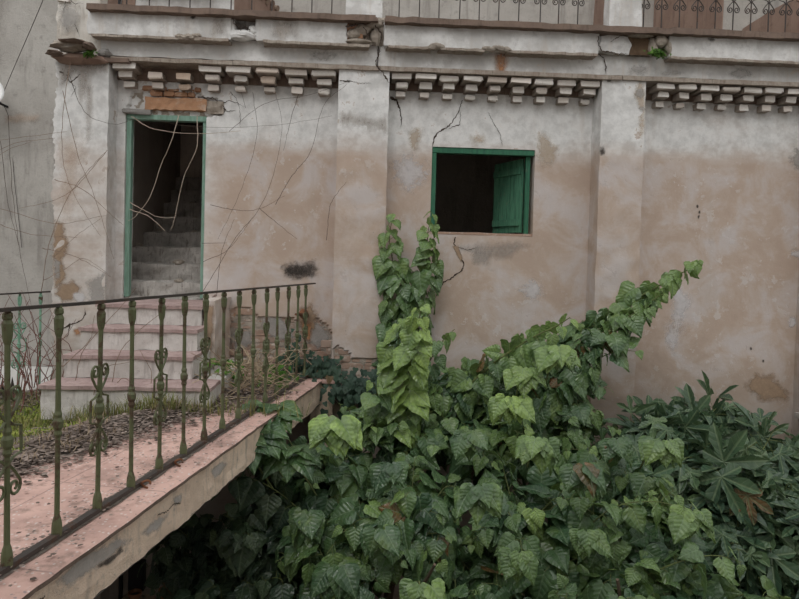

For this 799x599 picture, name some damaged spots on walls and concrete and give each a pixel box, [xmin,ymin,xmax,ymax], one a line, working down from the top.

crack [346,23,402,125]
crack [597,35,626,71]
crack [433,100,463,143]
peeling [53,224,79,302]
crack [436,237,477,296]
spalling [229,308,377,385]